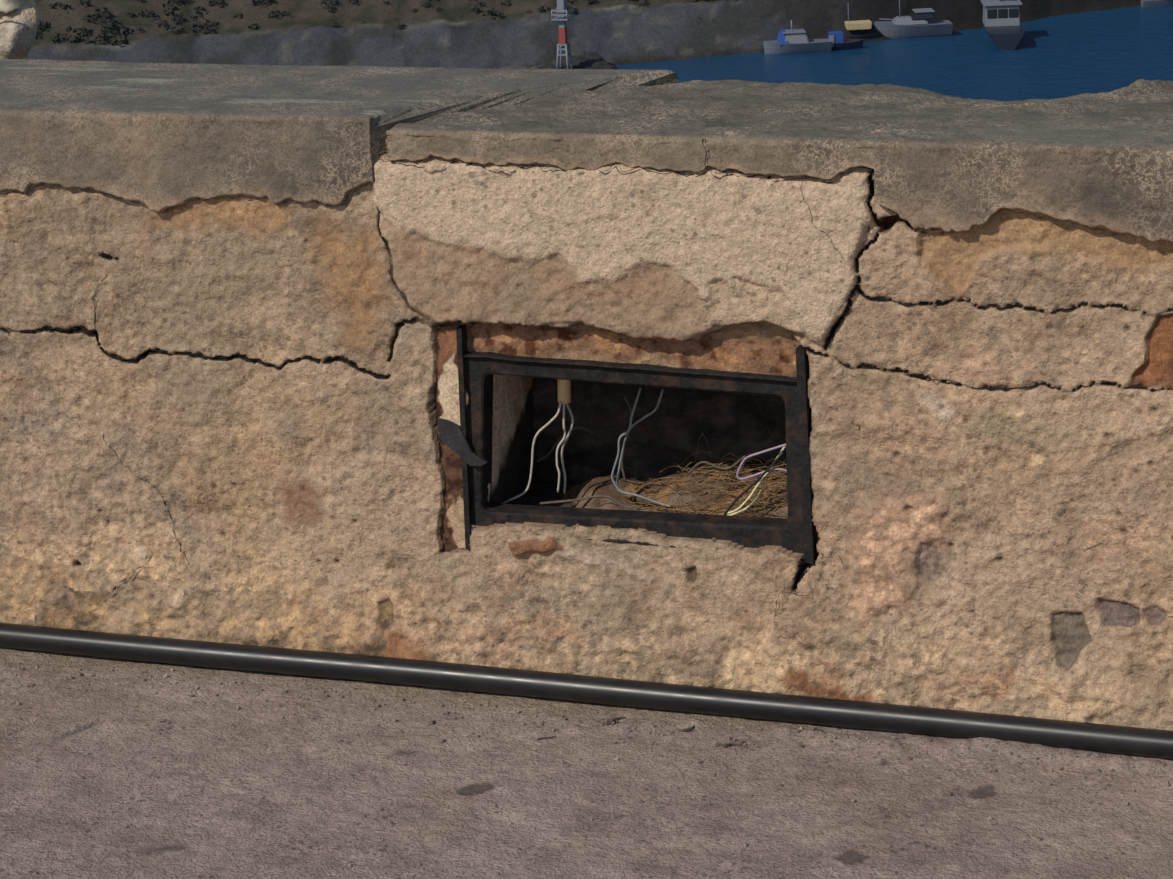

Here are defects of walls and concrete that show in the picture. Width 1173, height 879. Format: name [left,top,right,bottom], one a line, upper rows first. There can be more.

crack [0,139,1171,392]
corrosion [435,322,797,377]
spalling [718,321,802,342]
spalling [1130,314,1173,390]
peeling [438,354,468,426]
peeling [447,496,474,548]
spalling [508,537,562,557]
crack [775,552,843,615]
spalling [1051,612,1092,670]
spalling [1100,599,1166,626]